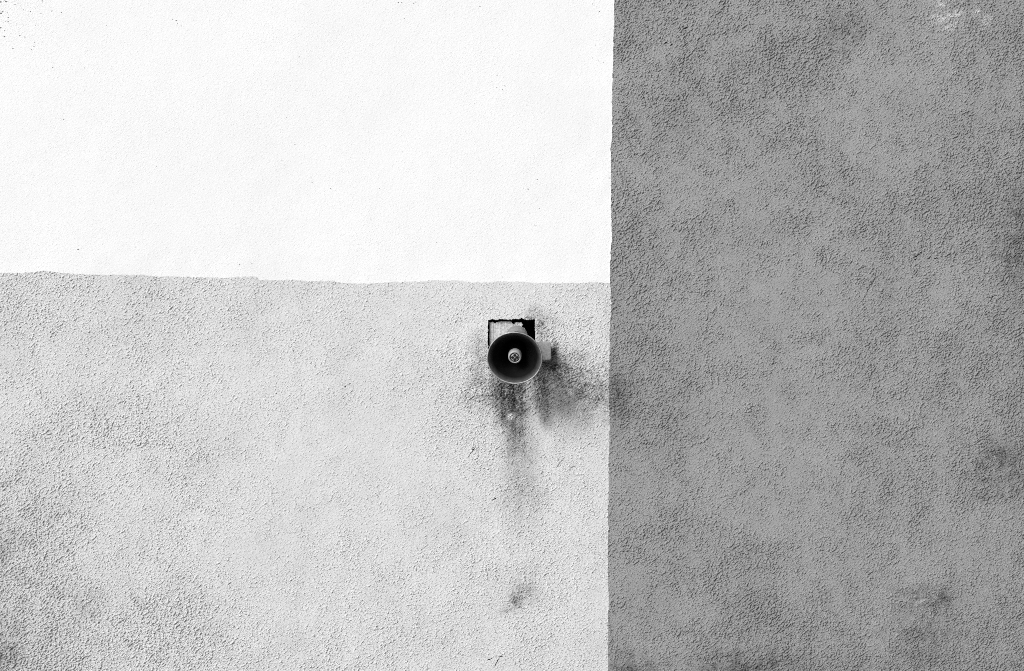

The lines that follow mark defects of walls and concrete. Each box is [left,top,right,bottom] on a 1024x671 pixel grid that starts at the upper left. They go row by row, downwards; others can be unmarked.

leakage [497,381,524,432]